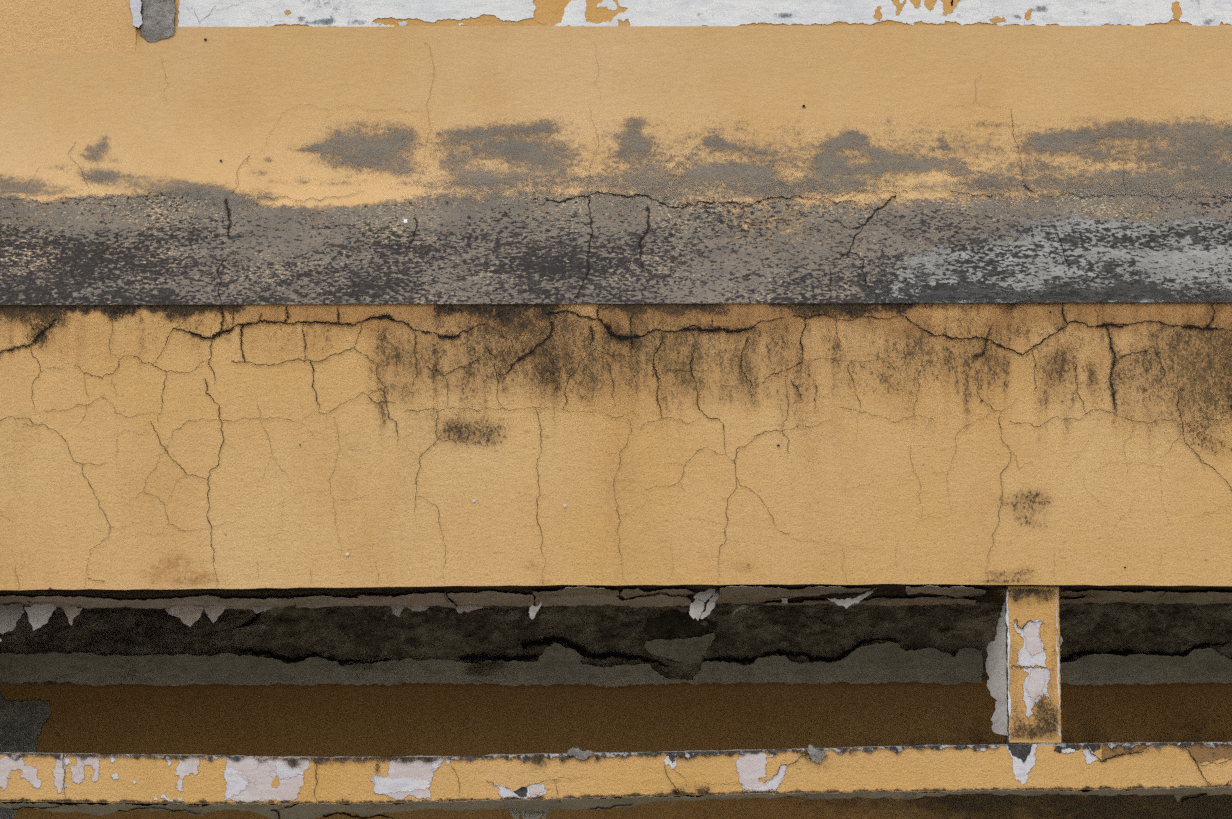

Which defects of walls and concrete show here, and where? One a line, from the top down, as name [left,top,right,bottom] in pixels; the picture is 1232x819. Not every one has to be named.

peeling [533,0,627,26]
peeling [874,0,960,21]
peeling [1171,1,1182,19]
crack [951,79,1214,199]
damp [0,114,1232,455]
crack [0,112,1232,670]
flaking render [0,585,1232,819]
damp [0,781,1232,819]